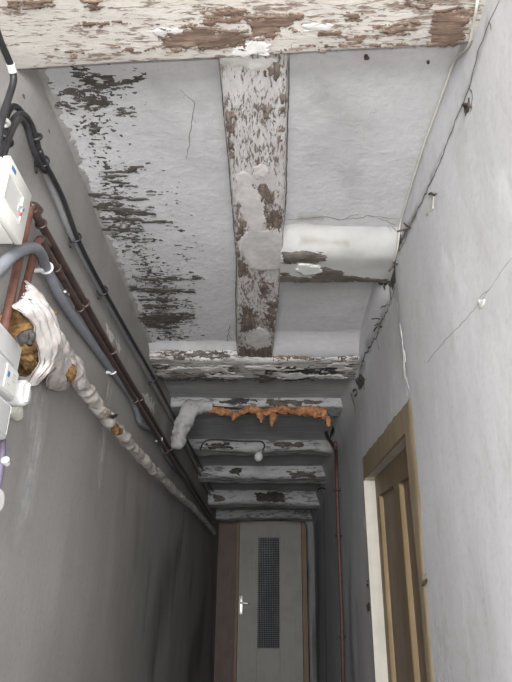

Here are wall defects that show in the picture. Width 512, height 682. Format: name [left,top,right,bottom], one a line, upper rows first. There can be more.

peeling [7,0,56,11]
peeling [80,0,105,11]
peeling [75,20,131,28]
peeling [110,0,474,58]
peeling [263,62,285,81]
crack [181,90,195,158]
peeling [225,110,237,159]
peeling [66,81,200,341]
peeling [252,183,283,232]
flaking render [237,250,396,333]
crack [360,289,395,369]
peeling [155,342,365,391]